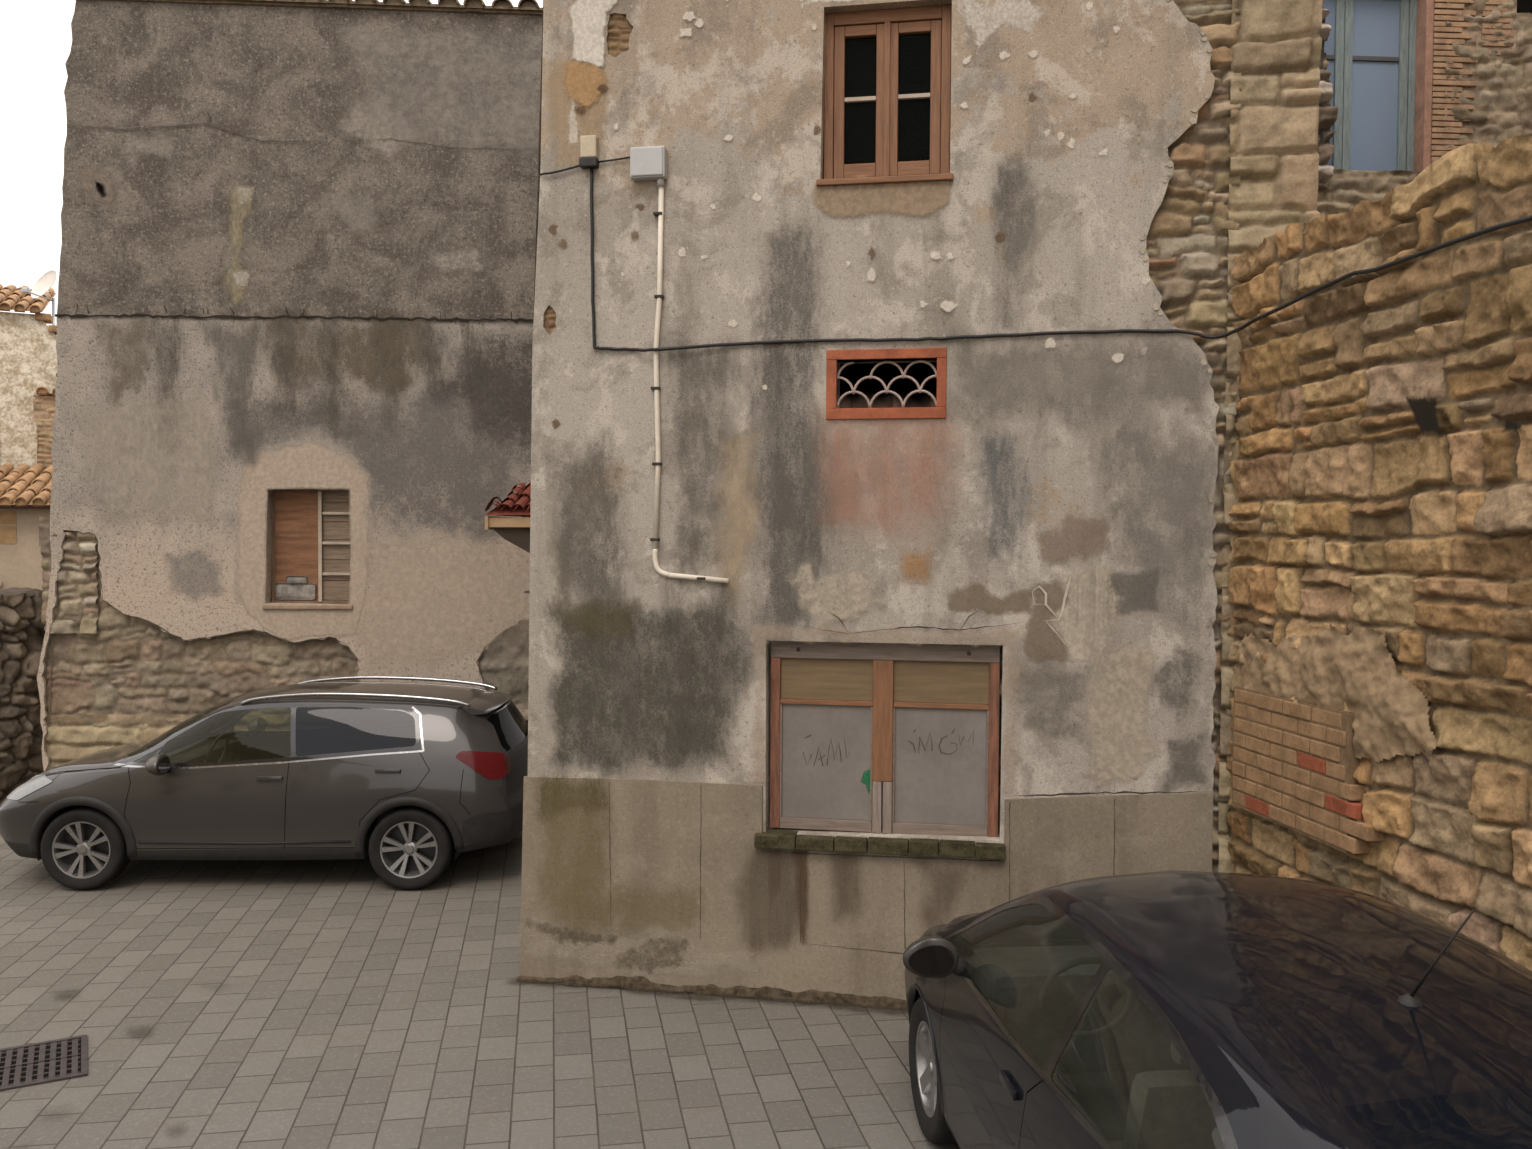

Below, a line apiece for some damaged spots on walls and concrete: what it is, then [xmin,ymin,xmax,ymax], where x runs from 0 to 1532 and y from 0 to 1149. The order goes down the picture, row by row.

peeling [564,0,633,144]
peeling [680,12,703,36]
peeling [963,0,1042,64]
damp [108,319,177,426]
damp [211,315,533,538]
peeling [867,248,876,281]
peeling [920,300,958,312]
peeling [1111,347,1148,364]
flaking render [1139,0,1242,872]
flaking render [38,517,360,770]
damp [541,446,748,813]
damp [525,848,797,975]